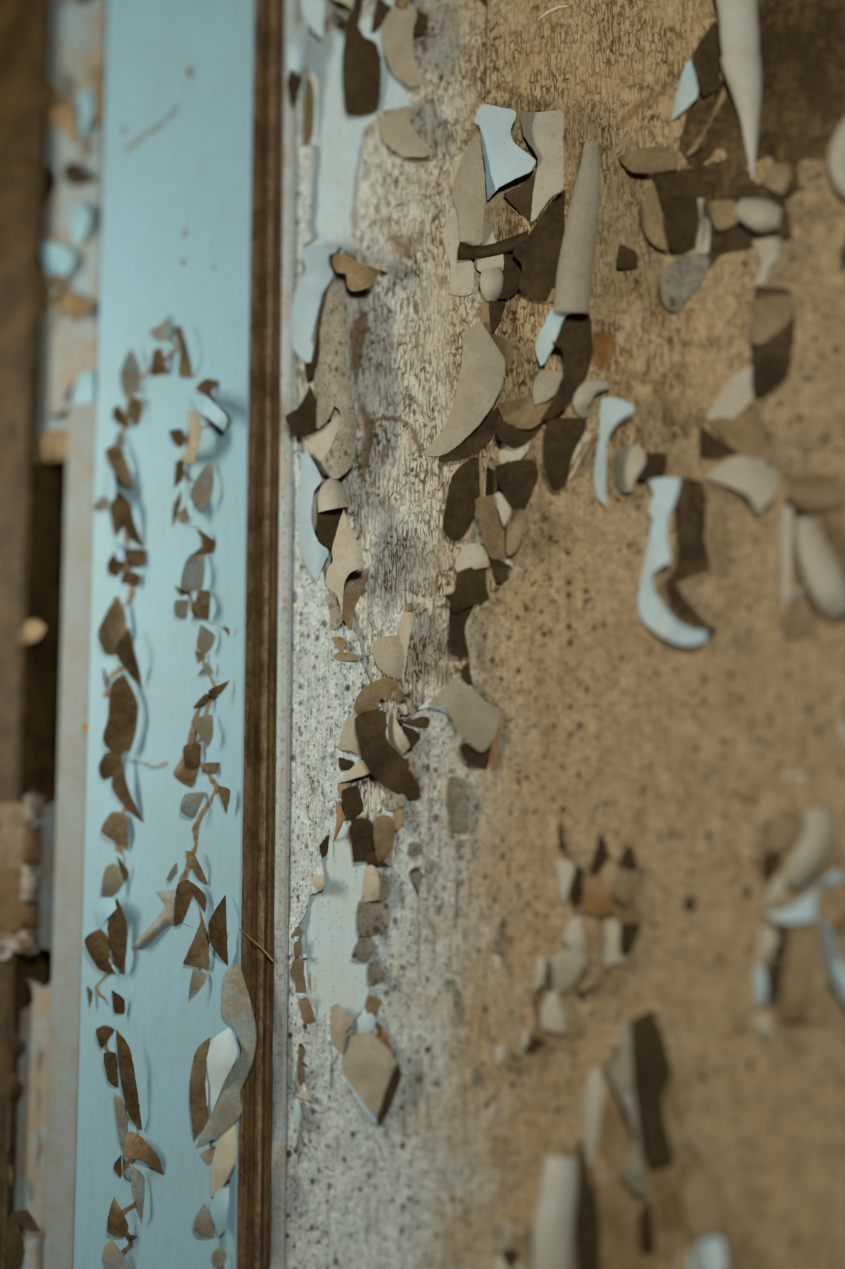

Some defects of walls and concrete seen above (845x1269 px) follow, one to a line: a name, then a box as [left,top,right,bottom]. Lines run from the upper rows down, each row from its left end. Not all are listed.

peeling [28,0,106,465]
peeling [21,620,45,645]
peeling [285,0,845,1126]
peeling [84,314,256,1269]
peeling [10,1033,26,1150]
peeling [6,1209,41,1269]
peeling [293,1044,313,1167]
peeling [495,1011,728,1269]